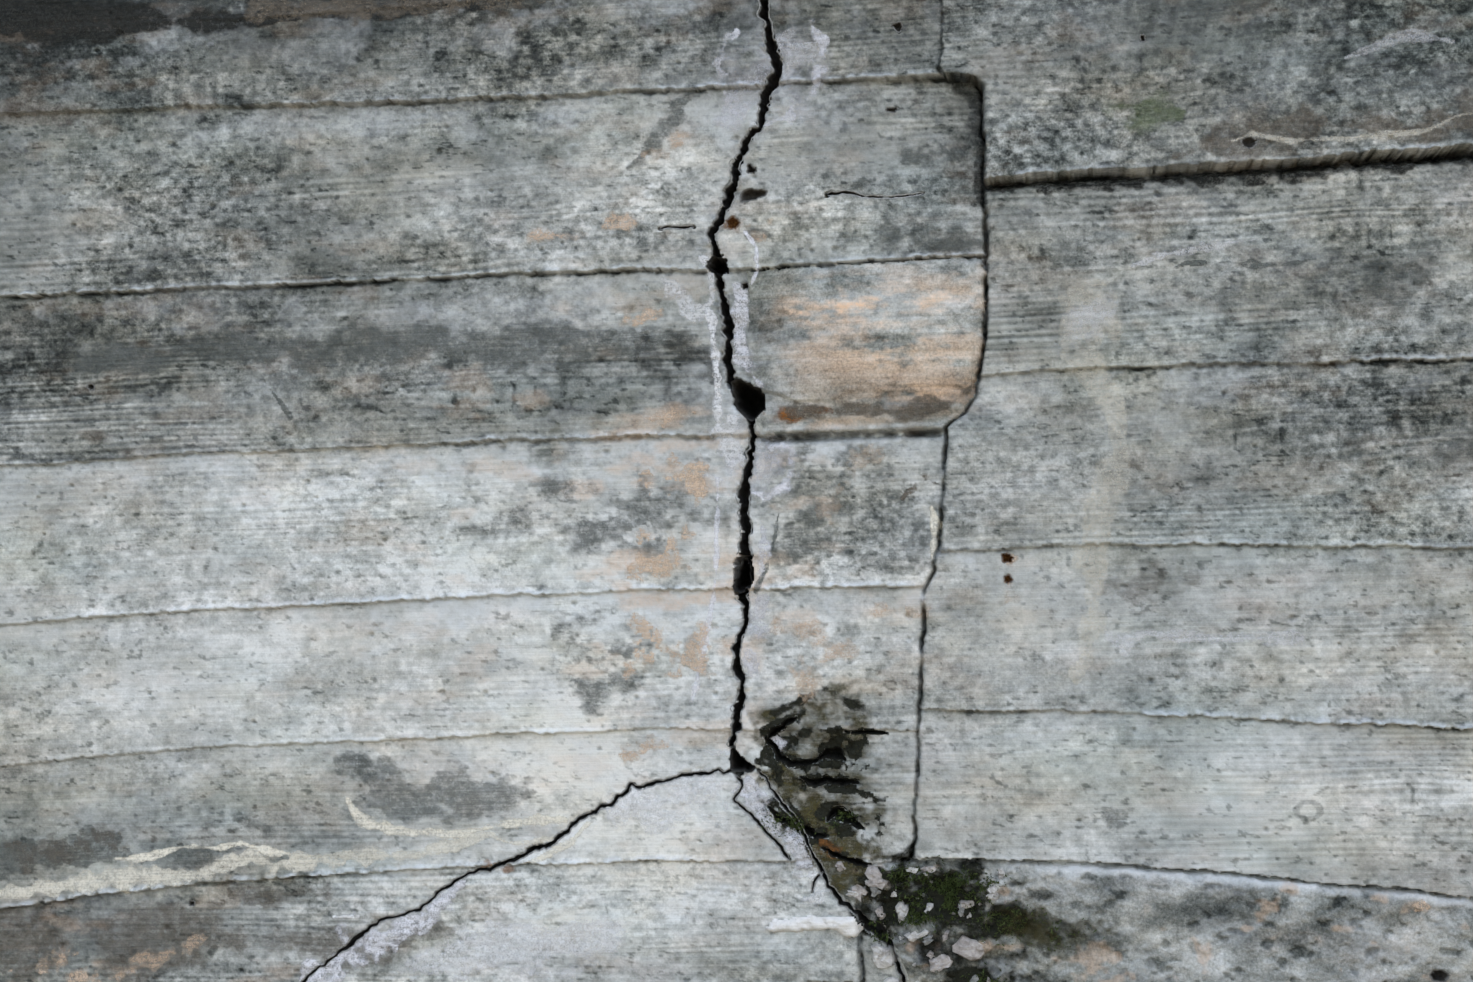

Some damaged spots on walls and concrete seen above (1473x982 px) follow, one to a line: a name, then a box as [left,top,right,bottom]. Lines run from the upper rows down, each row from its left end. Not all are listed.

crack [827,190,924,199]
crack [299,0,907,982]
water stain [735,776,824,902]
water stain [850,858,1077,982]